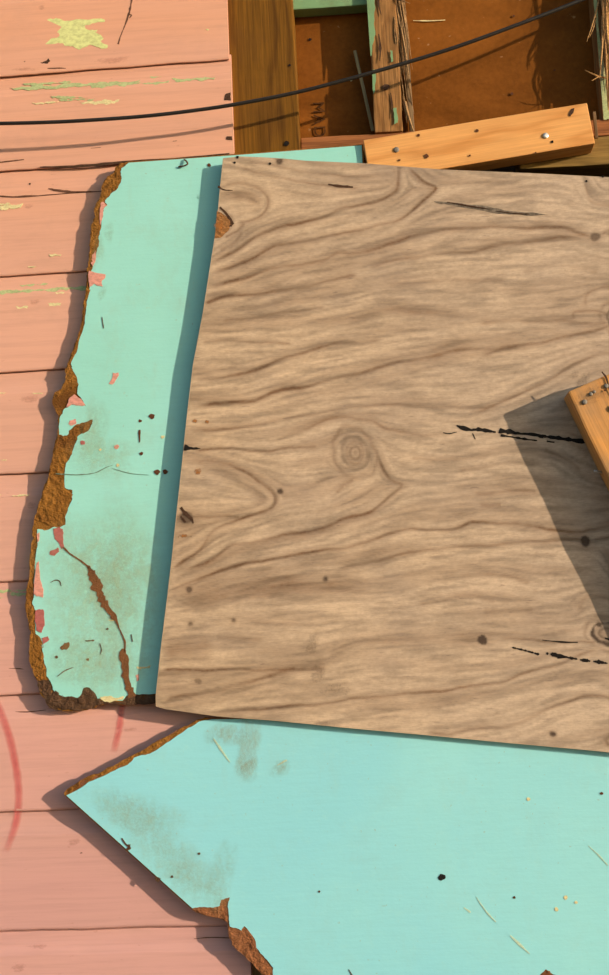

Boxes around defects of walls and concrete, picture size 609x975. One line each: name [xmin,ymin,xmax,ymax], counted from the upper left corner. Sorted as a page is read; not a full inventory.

peeling [46,18,108,50]
crack [117,0,132,44]
peeling [12,76,215,105]
spalling [0,162,128,407]
spalling [0,418,156,711]
crack [63,547,136,698]
spalling [192,897,273,975]